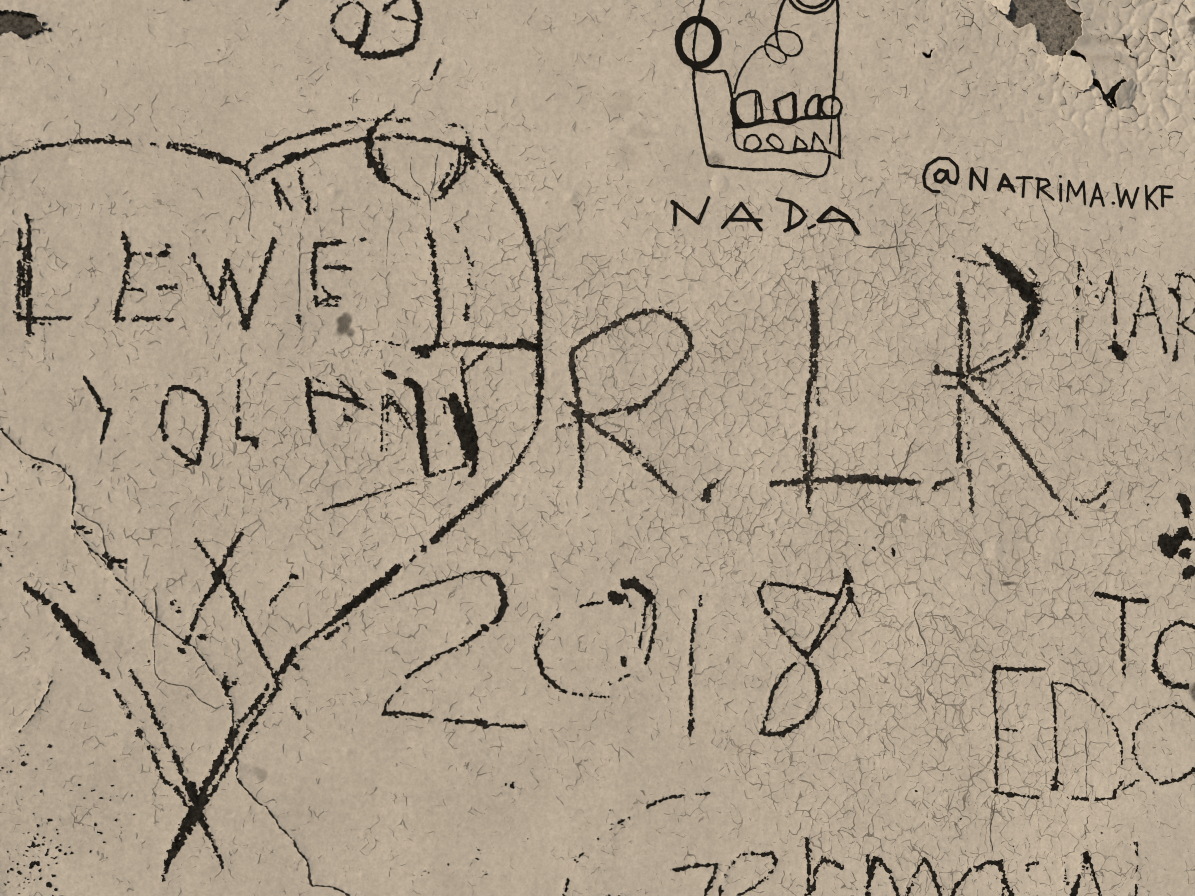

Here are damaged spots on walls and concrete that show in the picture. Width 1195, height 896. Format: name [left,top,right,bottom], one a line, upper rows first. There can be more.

spalling [0,10,51,40]
peeling [987,0,1136,109]
crack [231,170,254,238]
crack [386,154,438,265]
crack [850,195,940,272]
crack [1041,201,1062,259]
crack [298,213,306,336]
crack [890,438,916,492]
crack [0,428,350,896]
crack [876,593,927,668]
crack [1082,718,1090,840]
crack [988,795,996,851]